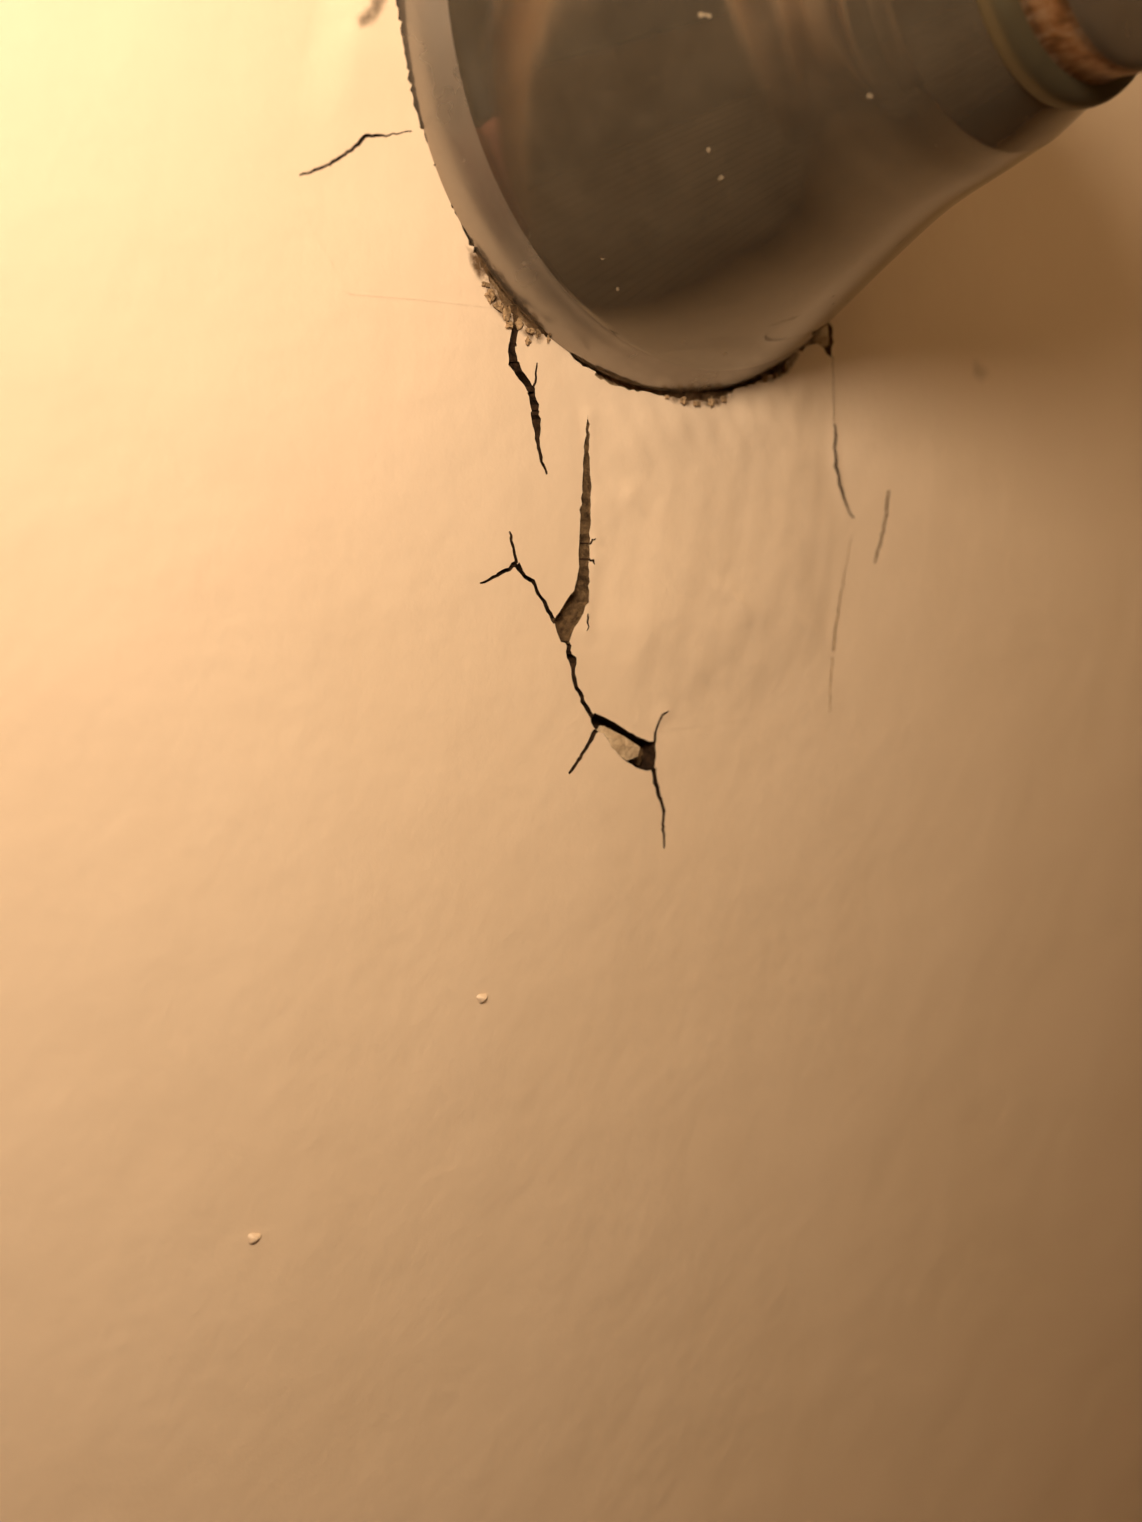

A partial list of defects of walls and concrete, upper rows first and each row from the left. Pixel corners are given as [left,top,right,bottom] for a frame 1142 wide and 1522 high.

crack [299,131,412,176]
crack [480,305,669,849]
crack [829,356,890,712]